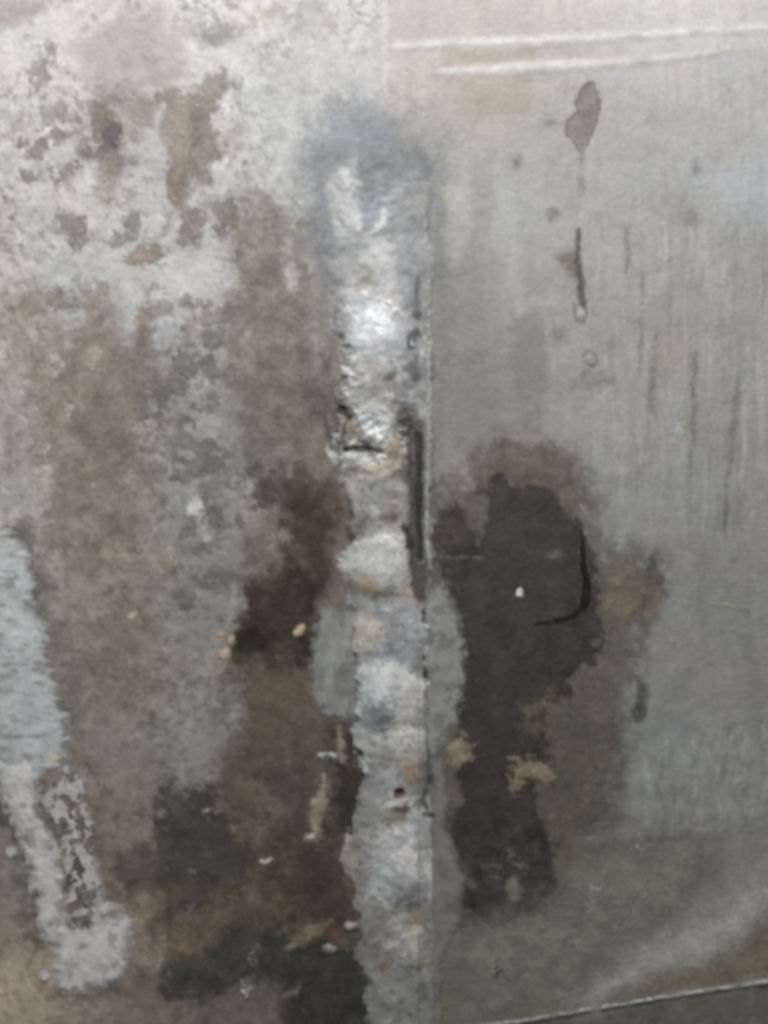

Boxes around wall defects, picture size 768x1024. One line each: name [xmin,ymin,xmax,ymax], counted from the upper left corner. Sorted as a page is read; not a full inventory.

damp [78,69,226,214]
damp [560,228,587,322]
damp [9,282,157,576]
crack [534,529,591,624]